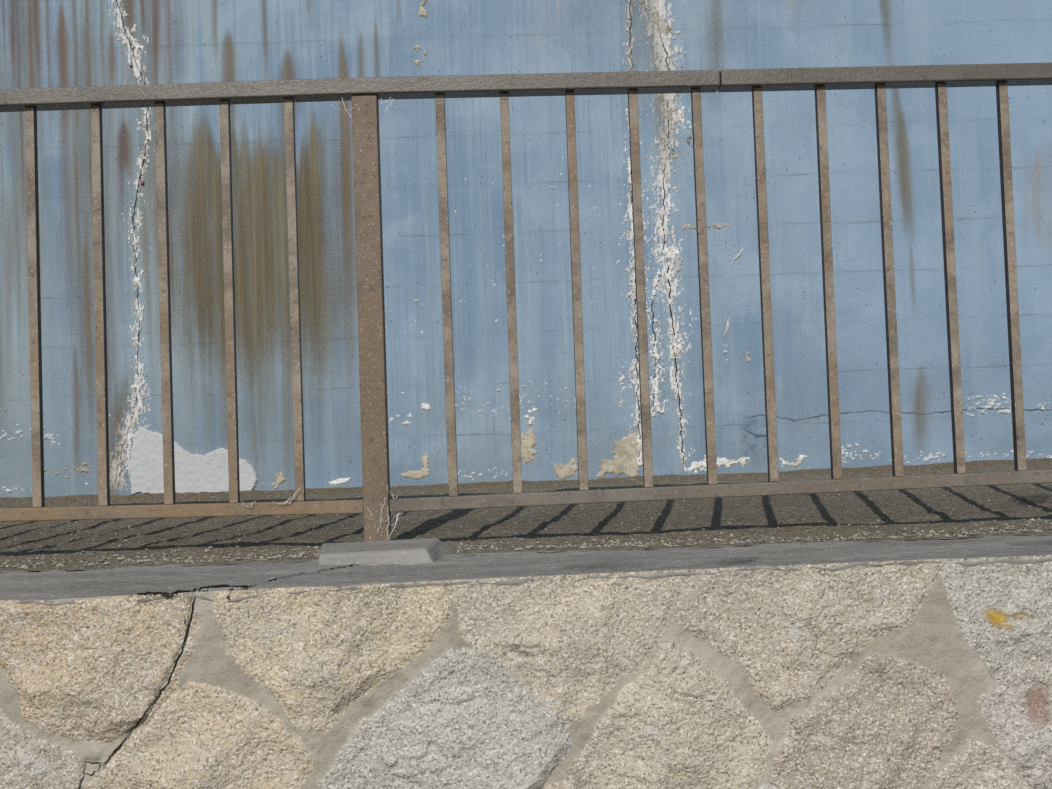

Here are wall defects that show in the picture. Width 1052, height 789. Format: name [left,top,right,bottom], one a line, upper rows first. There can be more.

rust [59,14,67,87]
rust [342,101,350,237]
peeling [128,427,287,495]
peeling [596,432,642,479]
crack [78,564,356,789]